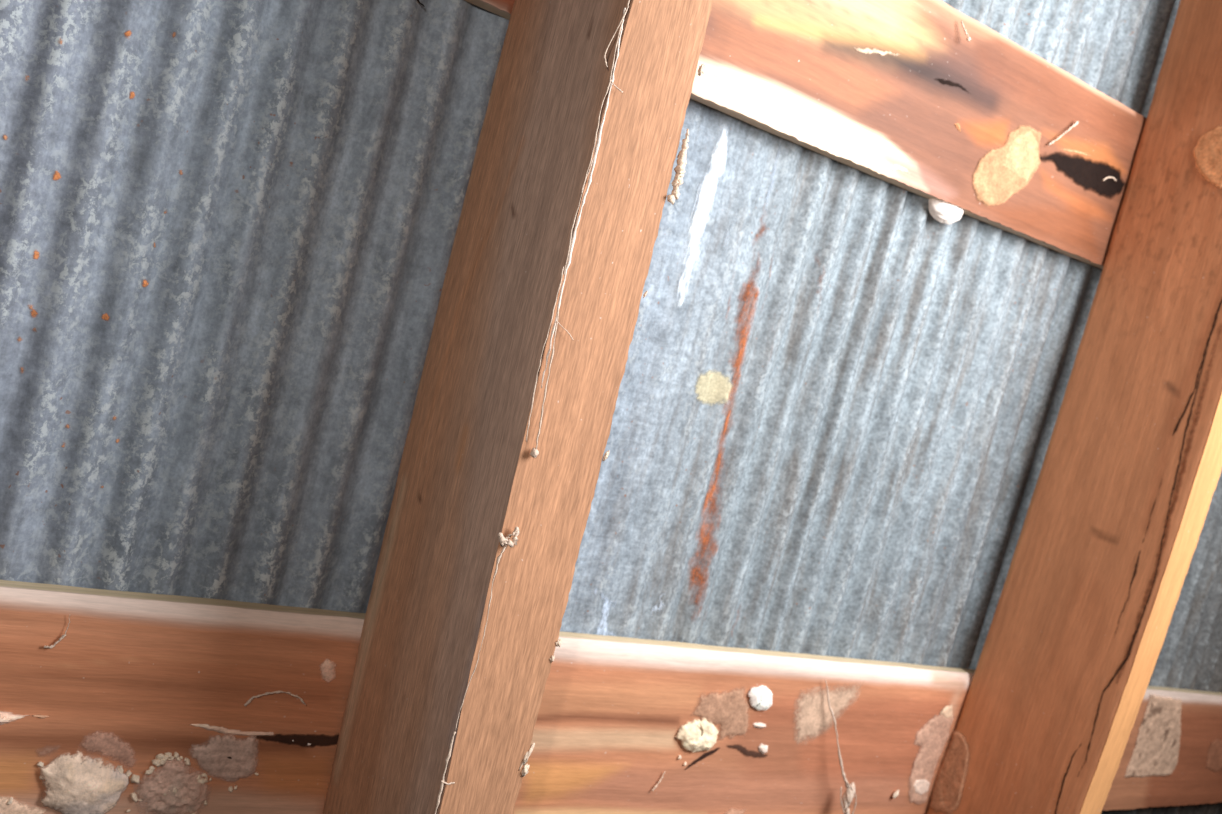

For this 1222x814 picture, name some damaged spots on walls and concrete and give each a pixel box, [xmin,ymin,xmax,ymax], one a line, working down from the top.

rust [691,281,758,604]
crack [1054,300,1222,814]